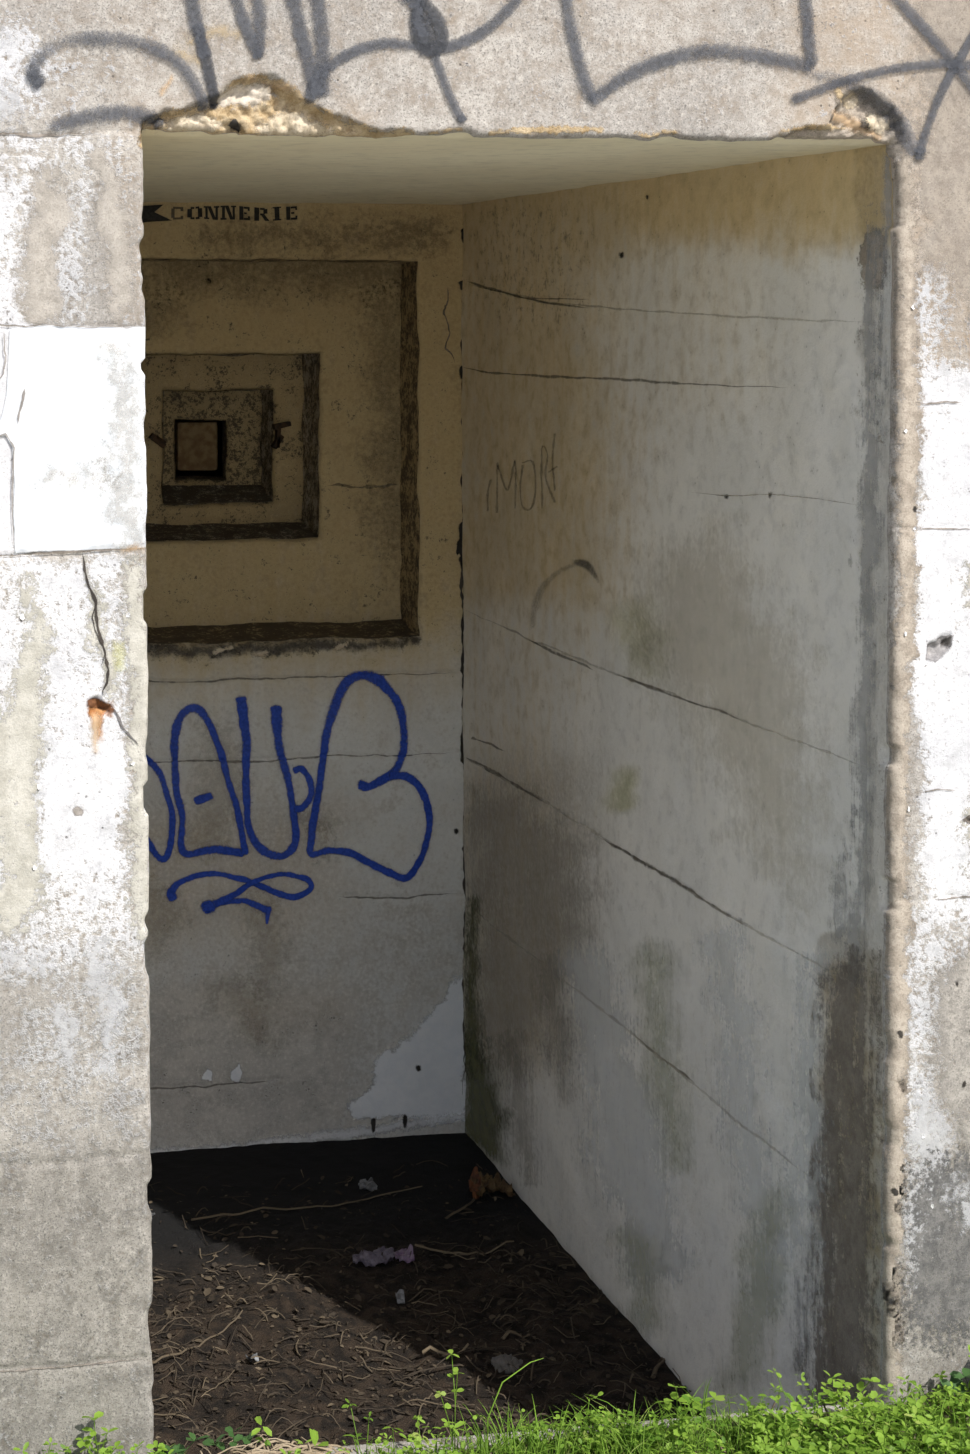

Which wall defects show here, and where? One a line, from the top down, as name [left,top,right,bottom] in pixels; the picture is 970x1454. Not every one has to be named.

spalling [137,74,463,148]
spalling [488,124,604,136]
crack [0,229,779,803]
rust [87,698,114,744]
peeling [779,0,970,1387]
crack [339,816,466,1093]
peeling [347,975,466,1128]
leakage [795,944,970,1406]